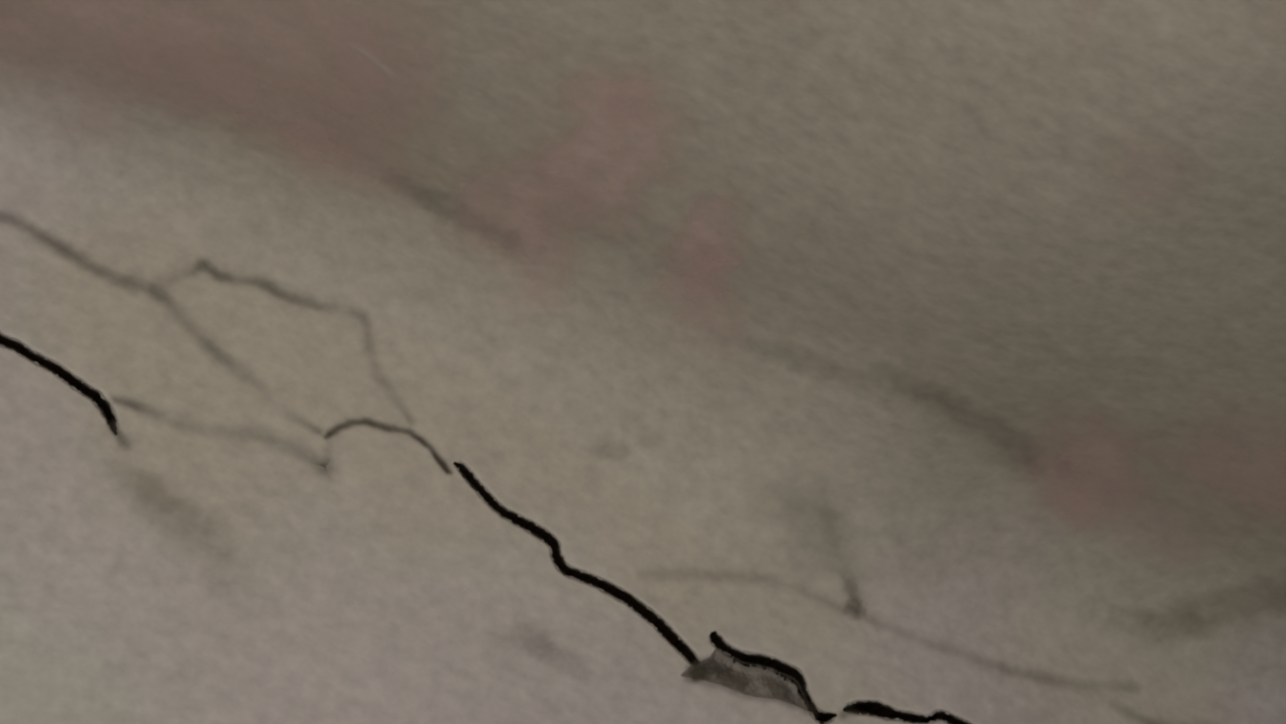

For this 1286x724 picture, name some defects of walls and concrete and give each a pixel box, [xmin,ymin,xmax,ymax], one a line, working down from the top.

crack [0,332,118,436]
crack [326,420,700,665]
crack [843,700,972,724]